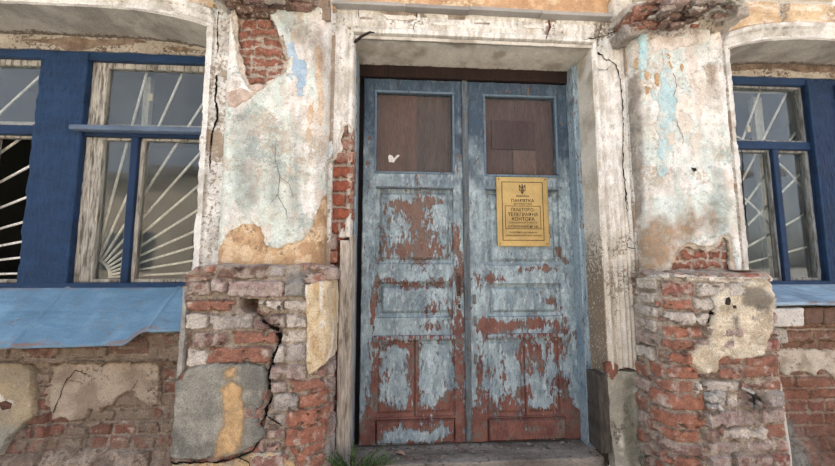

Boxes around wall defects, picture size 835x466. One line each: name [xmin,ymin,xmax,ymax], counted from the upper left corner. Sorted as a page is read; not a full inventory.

crack [209,75,219,173]
flaking render [226,9,325,142]
flaking render [218,121,355,266]
crack [584,22,635,249]
flaking render [669,234,735,271]
flaking render [0,361,163,456]
crack [170,314,283,466]
flaking render [171,286,296,466]
flaking render [304,279,339,375]
flaking render [776,347,835,380]